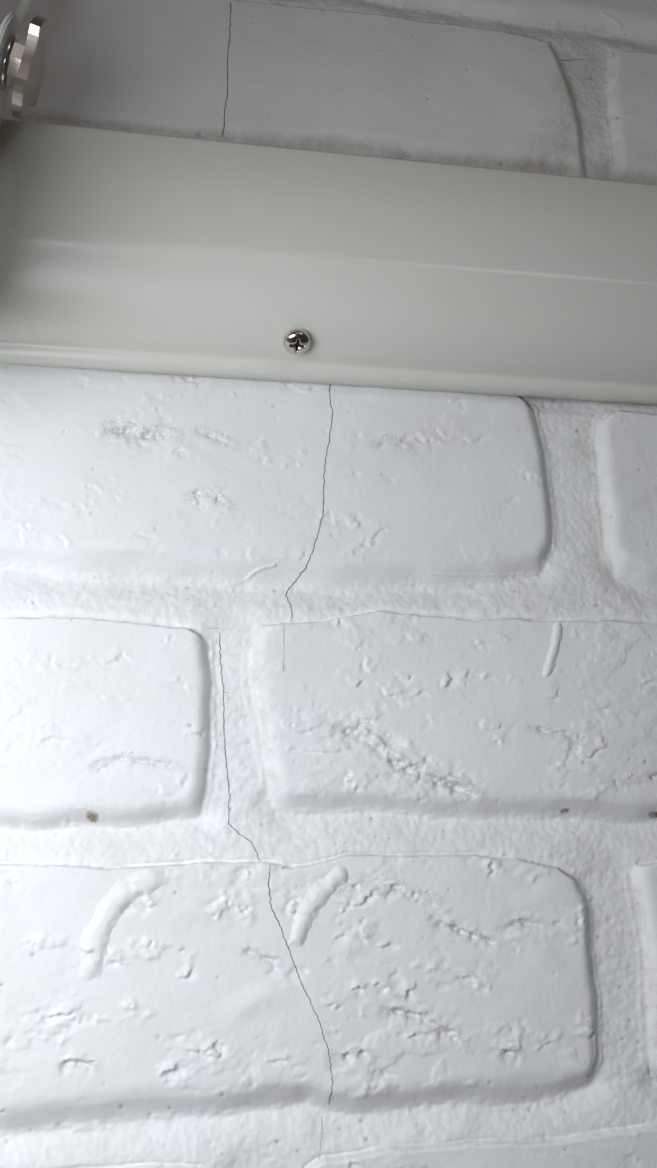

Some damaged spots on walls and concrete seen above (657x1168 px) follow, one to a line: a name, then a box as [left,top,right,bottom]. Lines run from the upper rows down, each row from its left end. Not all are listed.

crack [222,3,231,138]
crack [283,384,333,665]
crack [208,628,333,1153]